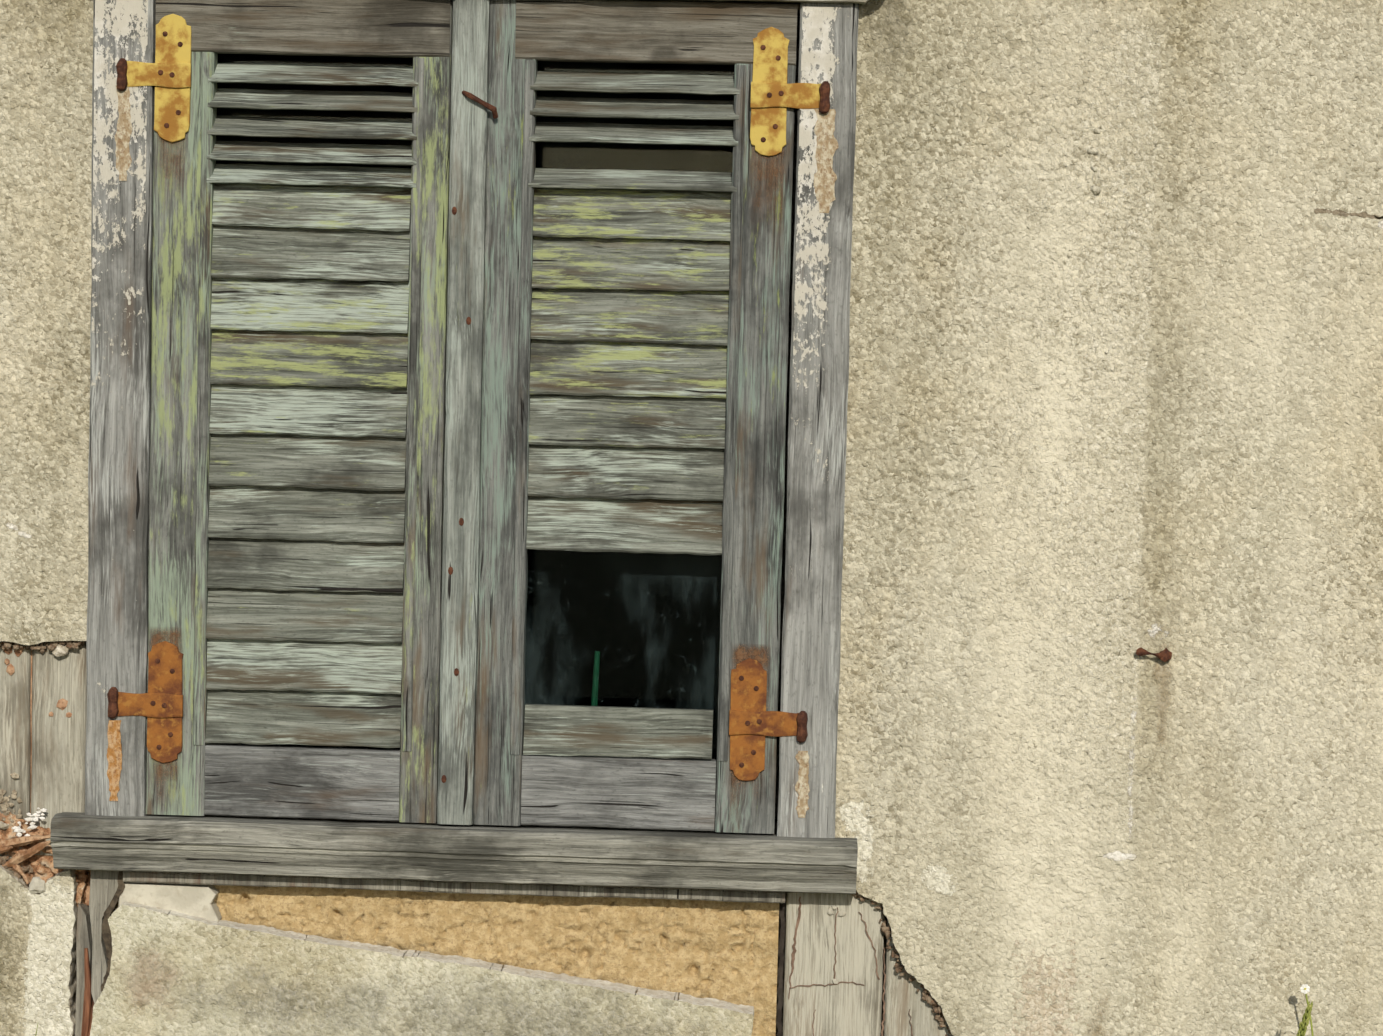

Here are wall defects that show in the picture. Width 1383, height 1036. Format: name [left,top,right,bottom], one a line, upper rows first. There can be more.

peeling [91,0,148,386]
peeling [792,7,842,390]
crack [1314,208,1383,229]
flaking render [0,629,107,1036]
crack [69,869,125,1036]
flaking render [112,801,957,1036]
peeling [987,918,1093,1036]